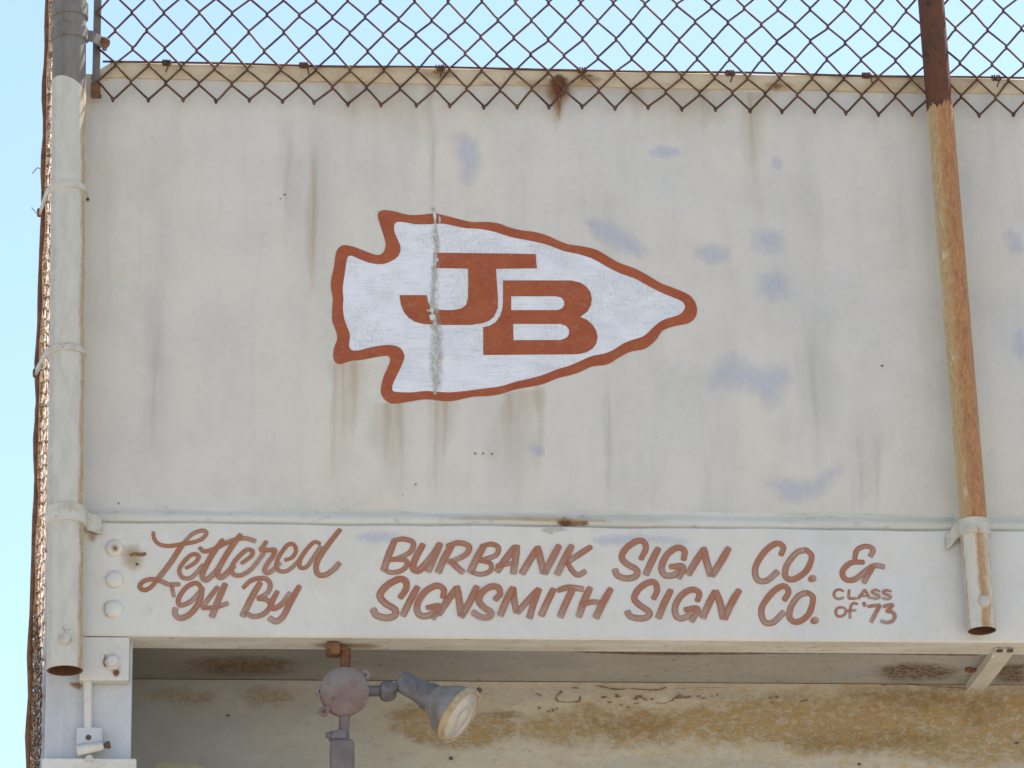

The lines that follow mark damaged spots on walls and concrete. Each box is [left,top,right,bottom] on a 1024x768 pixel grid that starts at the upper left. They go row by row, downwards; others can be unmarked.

rust [549,75,567,116]
crack [427,206,443,395]
rust [558,518,587,526]
rust [530,665,1024,762]